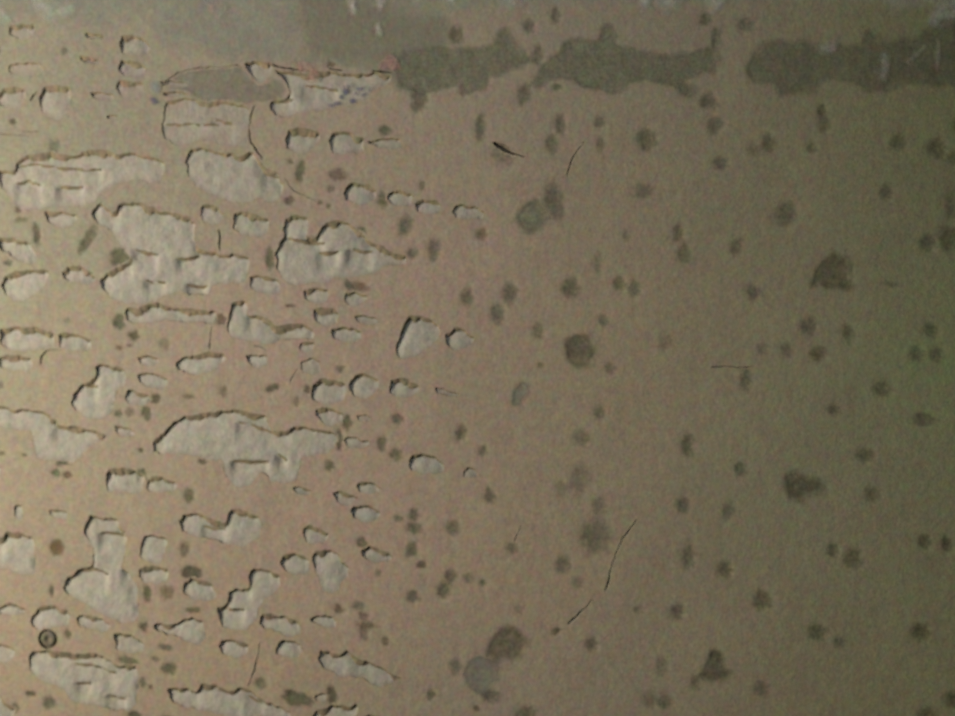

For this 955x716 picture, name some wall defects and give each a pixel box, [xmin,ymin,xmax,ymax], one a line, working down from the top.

spalling [245,61,403,181]
spalling [0,80,420,495]
spalling [106,467,193,501]
spalling [409,453,445,474]
spalling [0,504,375,716]
crack [567,519,637,624]